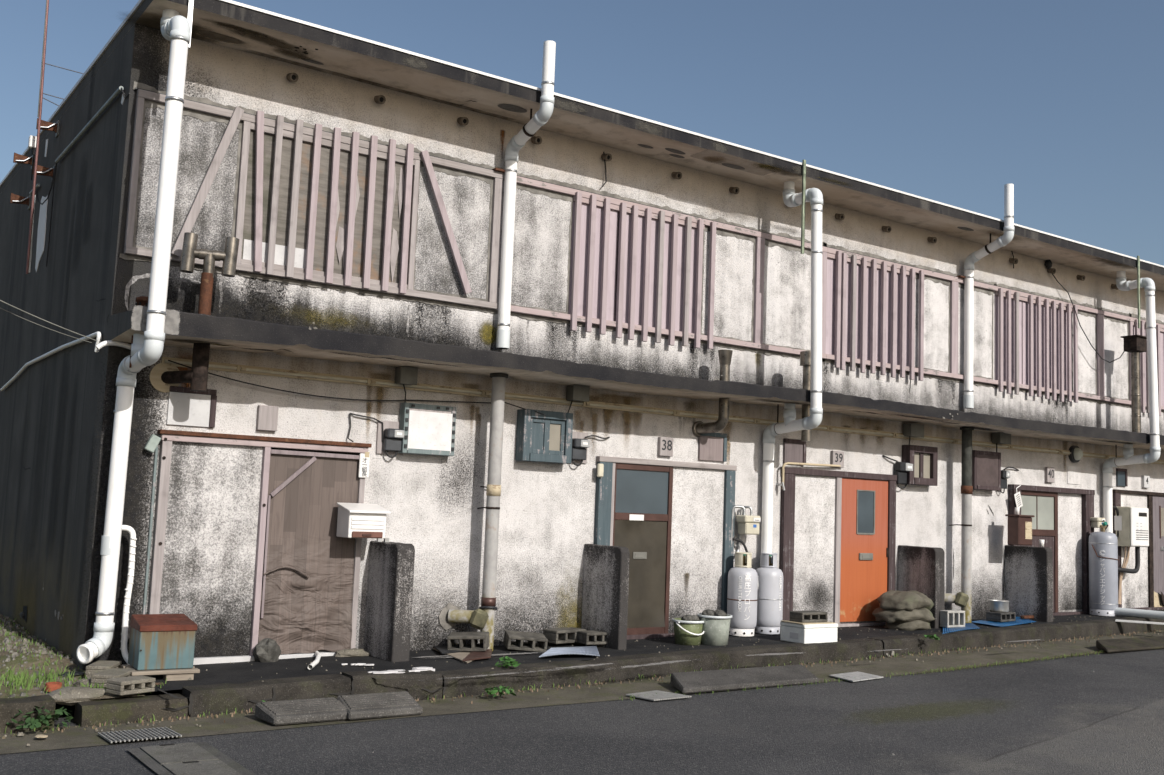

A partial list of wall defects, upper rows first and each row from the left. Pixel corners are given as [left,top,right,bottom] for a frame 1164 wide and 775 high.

water stain [128,16,161,30]
water stain [191,22,508,119]
water stain [166,274,493,350]
water stain [539,322,719,381]
water stain [434,441,488,516]
water stain [410,596,474,651]